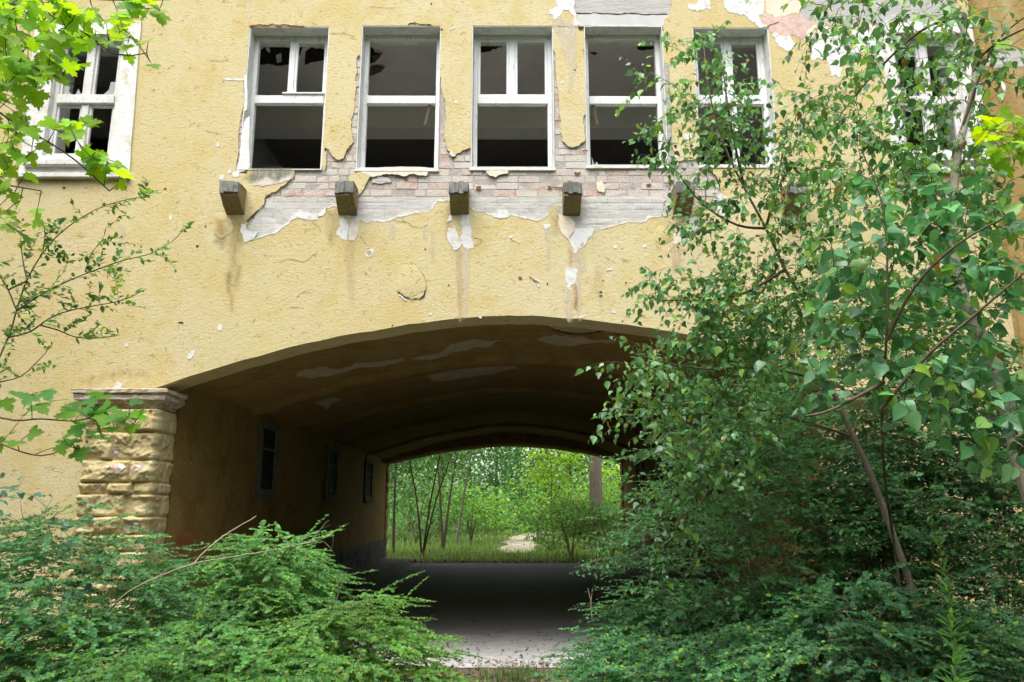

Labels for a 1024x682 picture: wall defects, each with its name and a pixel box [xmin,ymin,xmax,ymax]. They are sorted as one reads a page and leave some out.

flaking render [548,0,671,28]
flaking render [686,0,951,78]
flaking render [219,51,728,253]